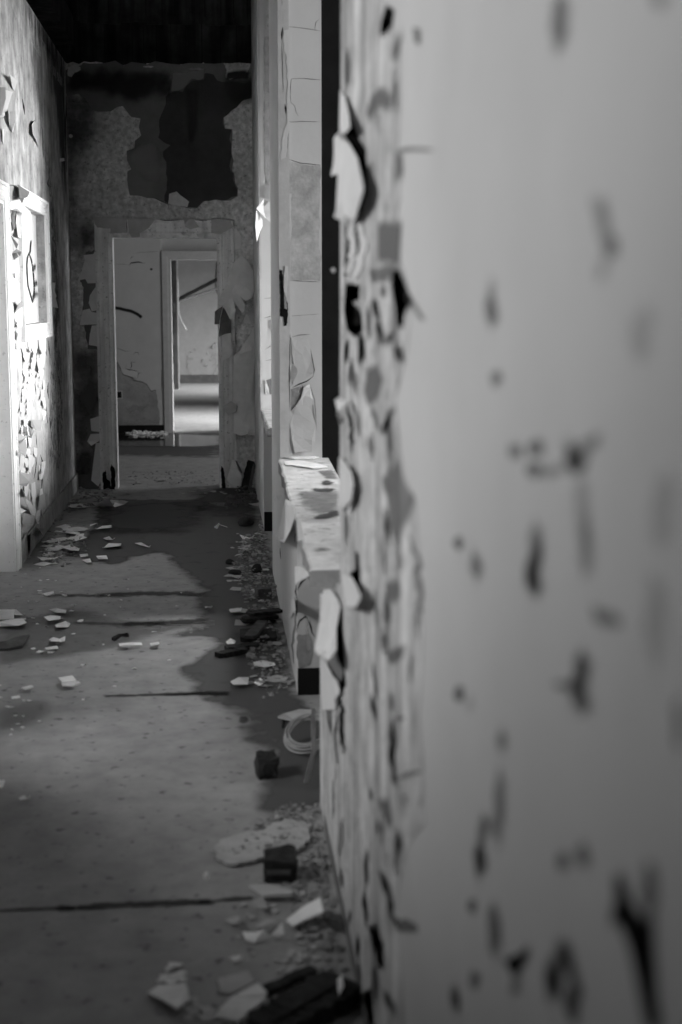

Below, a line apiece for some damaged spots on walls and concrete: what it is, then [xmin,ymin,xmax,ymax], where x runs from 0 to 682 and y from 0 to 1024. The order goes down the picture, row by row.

peeling [0,75,25,145]
peeling [10,210,51,564]
peeling [65,0,433,1024]